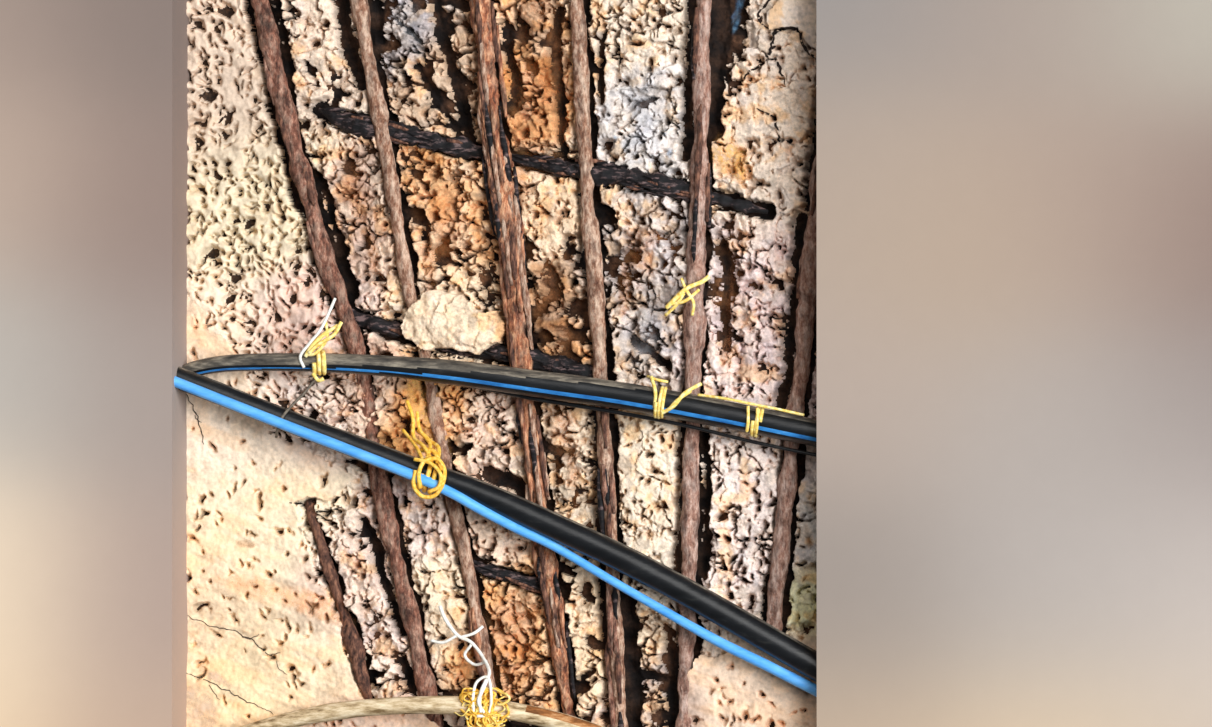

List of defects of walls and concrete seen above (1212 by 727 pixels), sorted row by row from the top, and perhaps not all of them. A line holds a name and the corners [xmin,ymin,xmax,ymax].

spalling [186,0,817,419]
spalling [245,371,817,727]